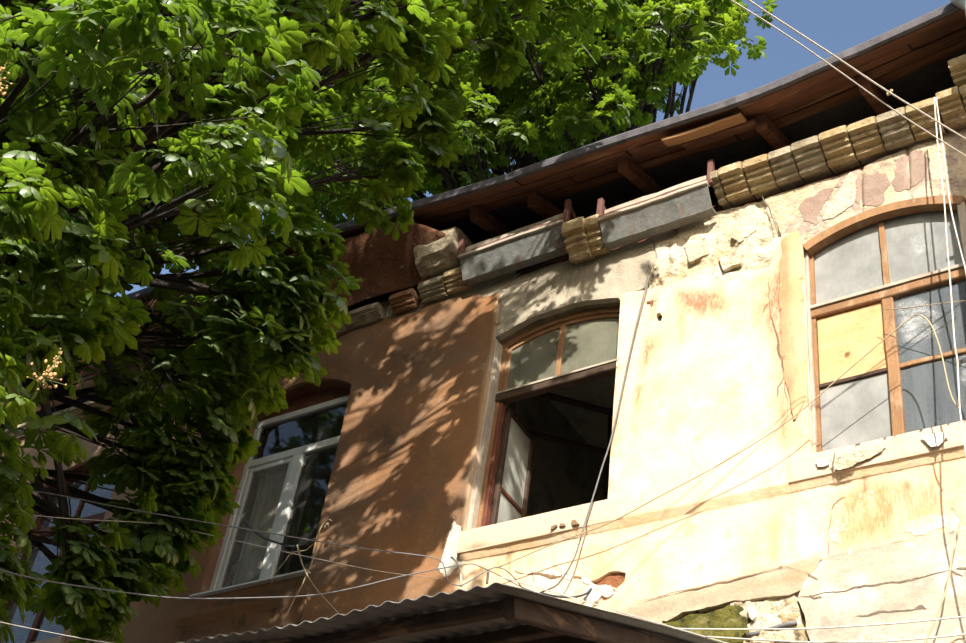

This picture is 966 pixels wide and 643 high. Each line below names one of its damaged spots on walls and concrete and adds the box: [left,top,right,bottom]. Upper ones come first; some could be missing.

spalling [647,127,966,290]
crack [763,278,788,413]
peeling [816,444,887,470]
peeling [903,514,950,547]
spalling [583,573,626,607]
crack [633,566,966,602]
spalling [730,595,810,643]
crack [858,605,930,617]